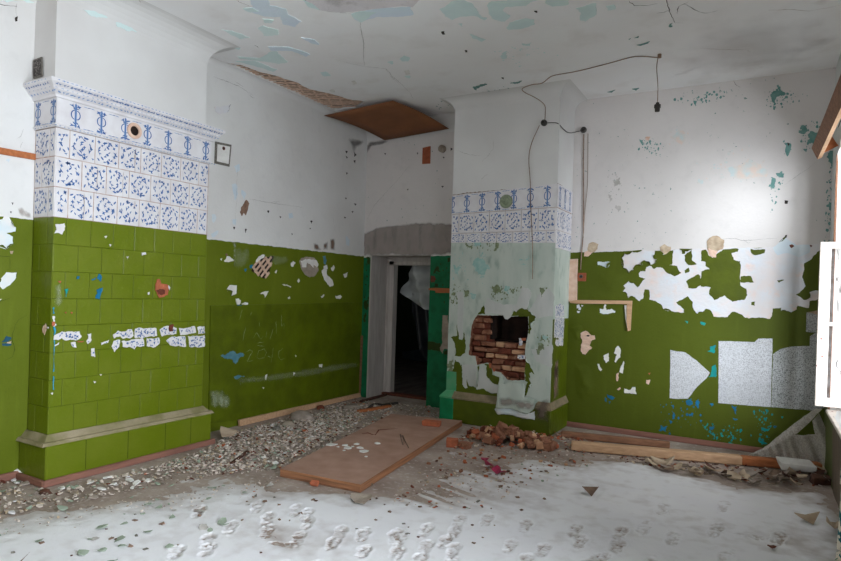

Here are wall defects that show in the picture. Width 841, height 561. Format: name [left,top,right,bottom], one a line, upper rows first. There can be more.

spalling [303,0,419,22]
peeling [440,0,597,30]
crack [629,0,715,23]
peeling [766,85,803,110]
peeling [0,217,16,254]
spalling [584,242,598,256]
peeling [621,148,841,445]
peeling [42,307,205,357]
peeling [428,241,564,420]
spalling [581,331,595,355]
peeling [598,346,636,403]